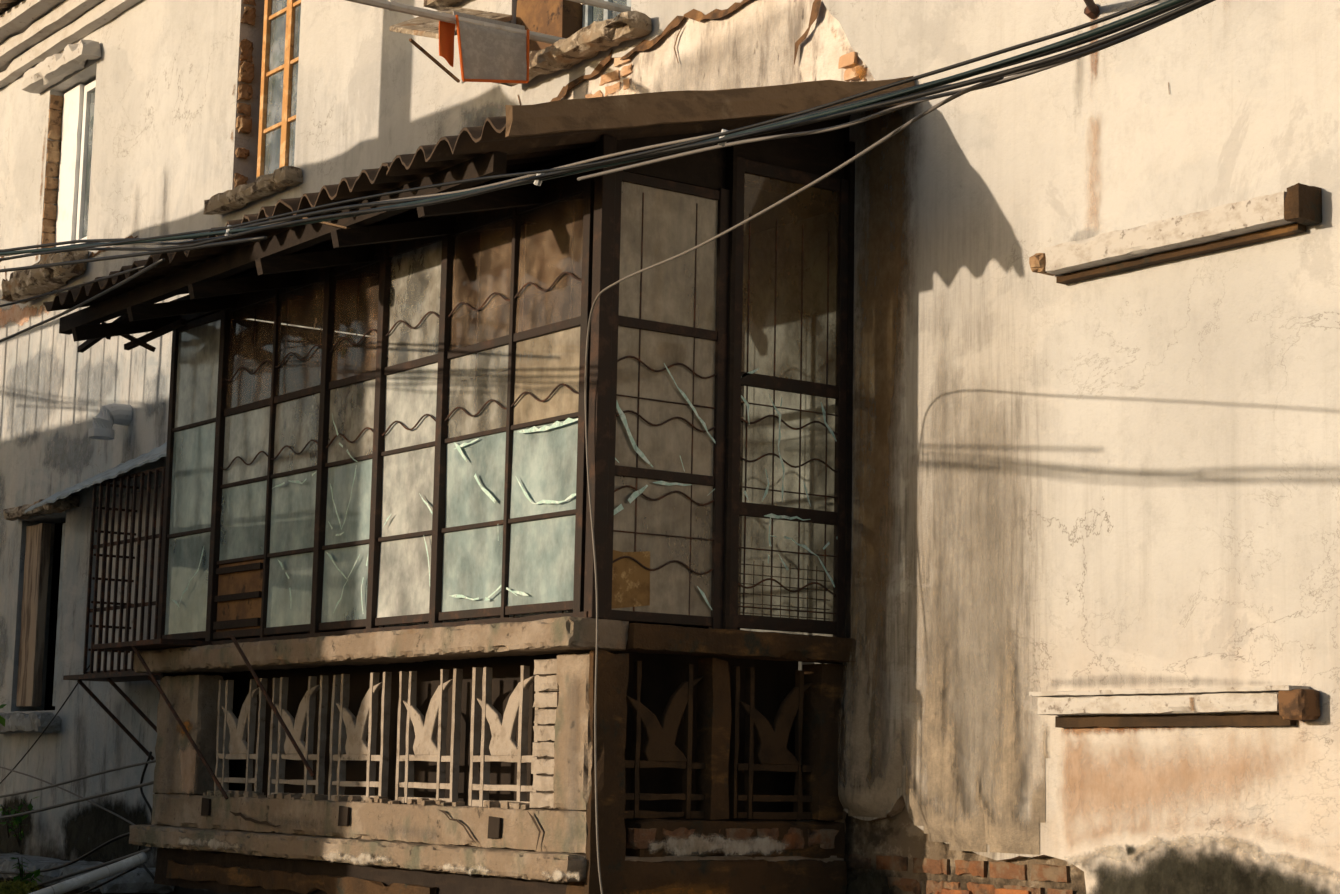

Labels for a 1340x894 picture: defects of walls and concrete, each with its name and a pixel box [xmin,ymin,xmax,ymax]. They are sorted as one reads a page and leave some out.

flaking render [561,0,875,100]
flaking render [41,95,64,258]
water stain [1064,727,1266,814]
spalling [626,795,1086,894]
water stain [1067,832,1339,894]